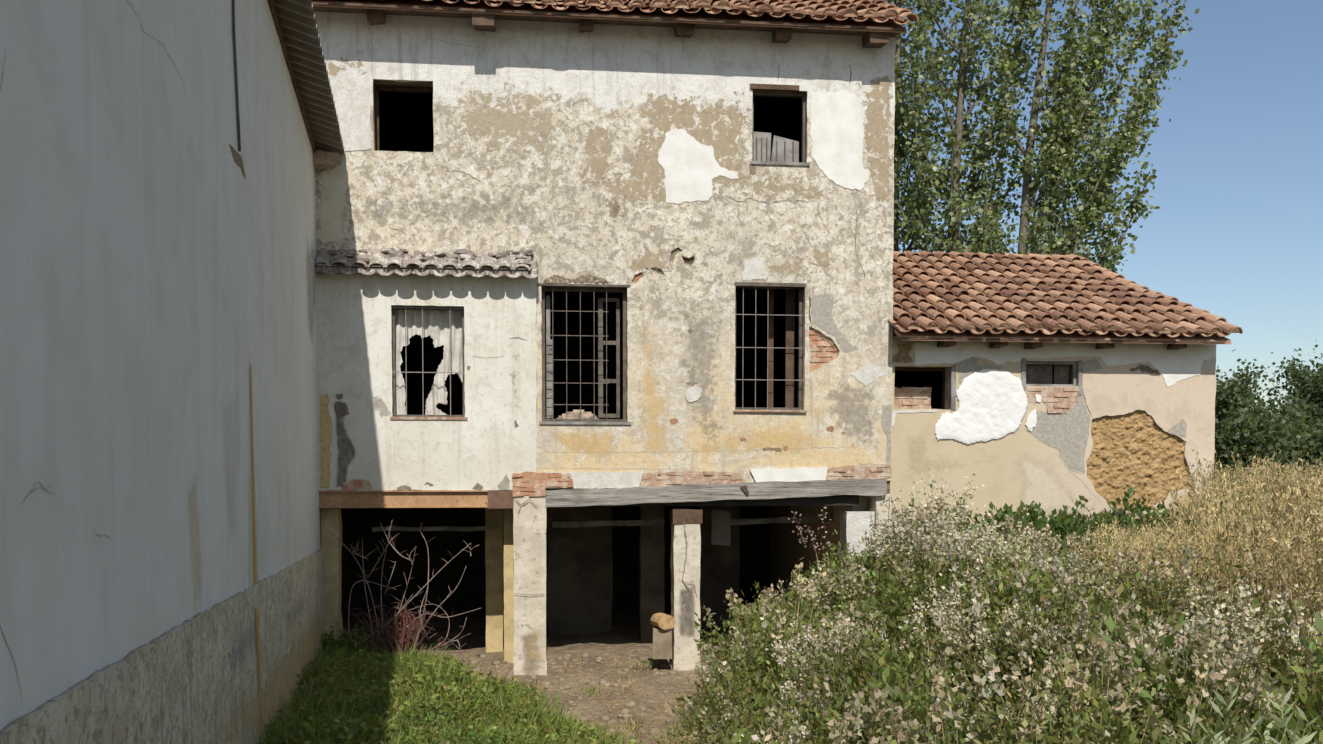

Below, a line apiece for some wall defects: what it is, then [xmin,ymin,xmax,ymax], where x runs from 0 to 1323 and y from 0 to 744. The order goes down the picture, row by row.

peeling [448,82,570,162]
peeling [582,87,825,221]
peeling [861,75,894,203]
peeling [630,246,694,283]
peeling [768,245,830,279]
peeling [809,294,858,371]
peeling [914,341,1216,387]
flaking render [472,471,574,497]
flaking render [640,471,746,487]
flaking render [827,404,892,480]
peeling [1026,387,1091,473]
spalling [1168,419,1186,438]